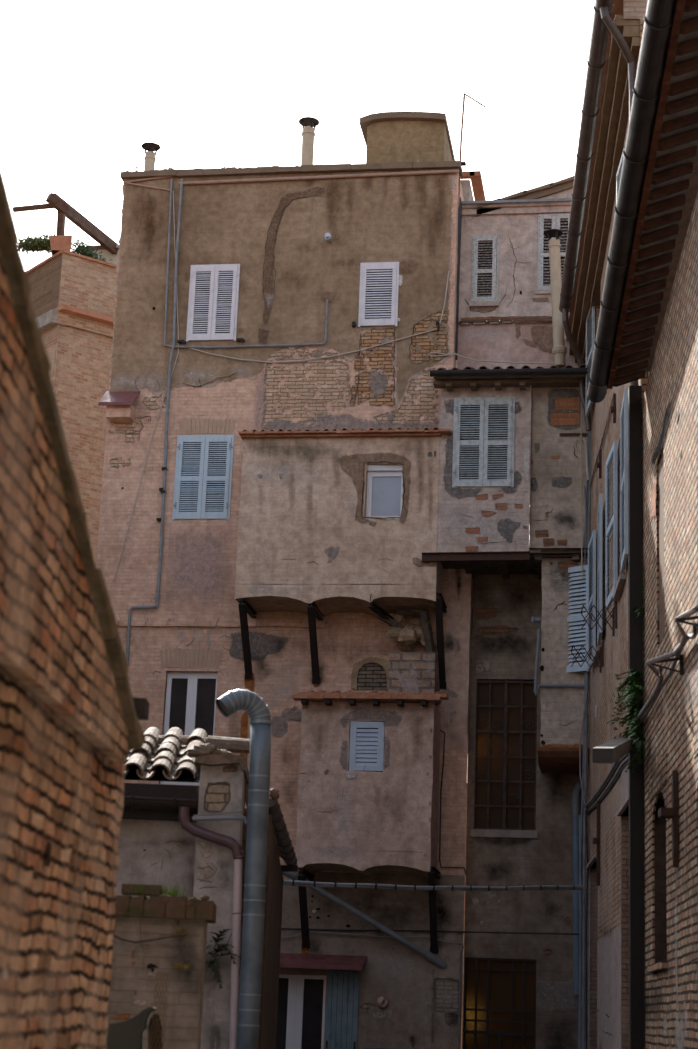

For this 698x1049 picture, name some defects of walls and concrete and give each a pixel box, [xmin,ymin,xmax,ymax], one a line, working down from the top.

crack [465,214,531,313]
spalling [261,306,552,429]
crack [393,311,439,405]
spalling [464,493,581,572]